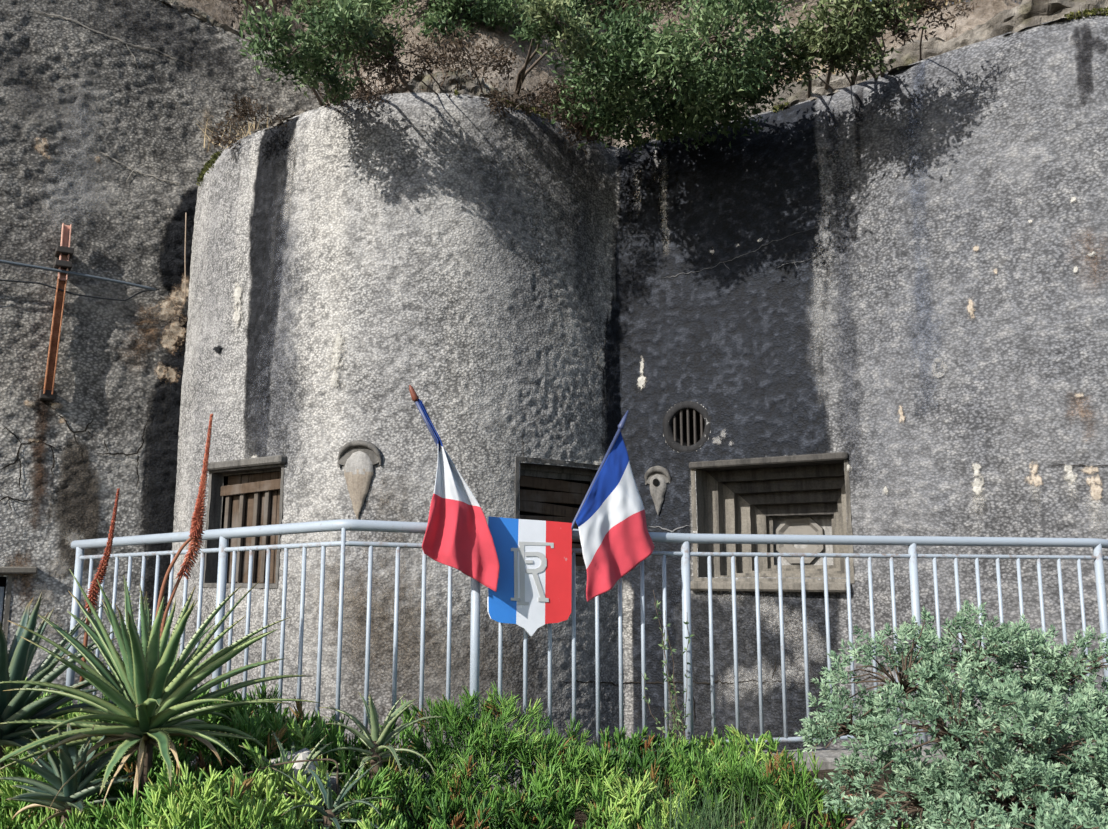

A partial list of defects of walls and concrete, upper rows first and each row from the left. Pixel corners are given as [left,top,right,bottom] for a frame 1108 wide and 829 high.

damp [855,88,863,166]
damp [158,186,198,298]
damp [244,116,305,457]
corrosion [30,378,48,527]
crack [0,411,148,512]
damp [141,312,188,630]
damp [602,100,858,755]
spalling [972,464,985,505]
spalling [1026,462,1042,491]
spalling [1064,465,1102,511]